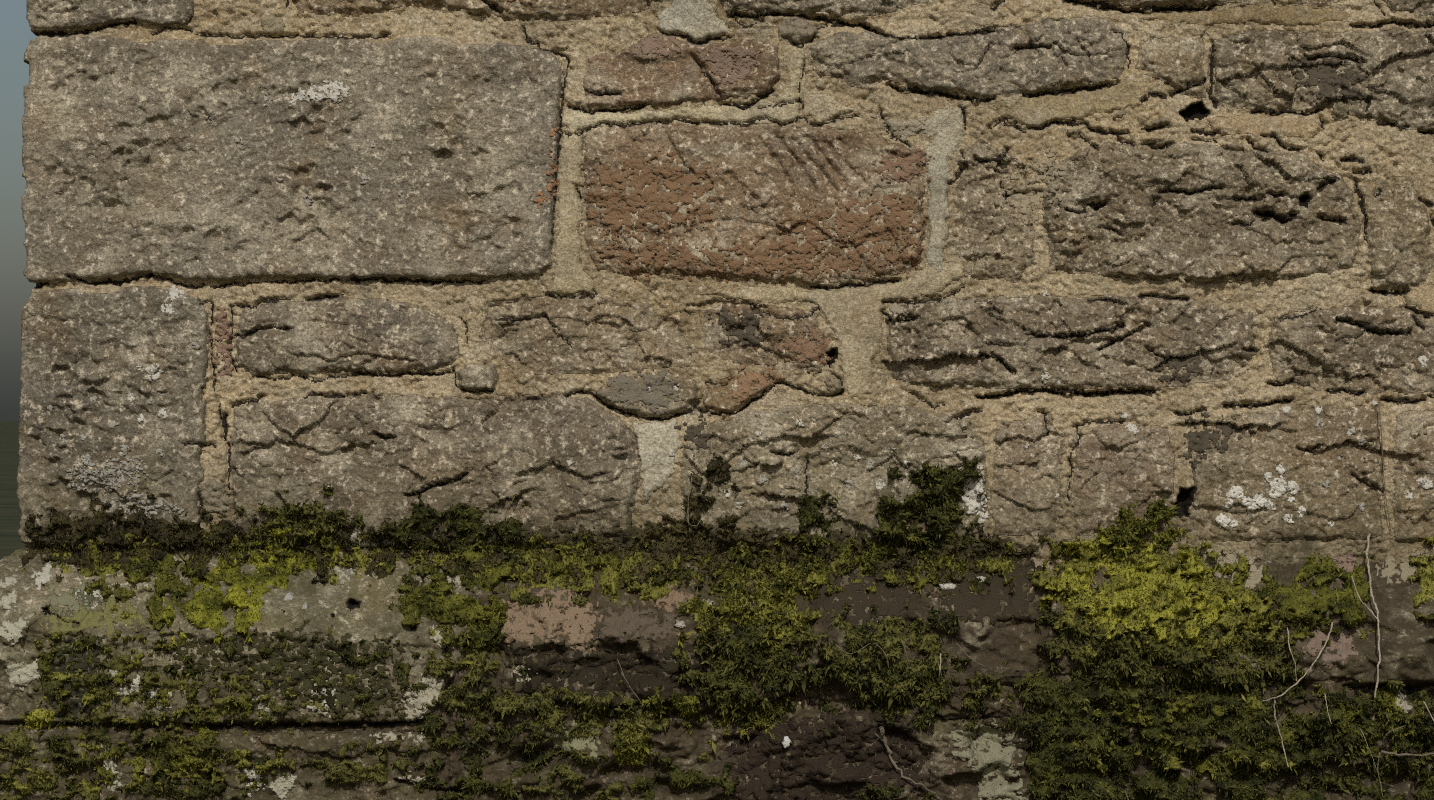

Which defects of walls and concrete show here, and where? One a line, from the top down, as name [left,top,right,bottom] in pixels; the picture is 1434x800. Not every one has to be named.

leakage [475,519,926,575]
leakage [37,631,117,723]
leakage [148,622,407,728]
leakage [500,638,714,724]
leakage [718,699,940,800]